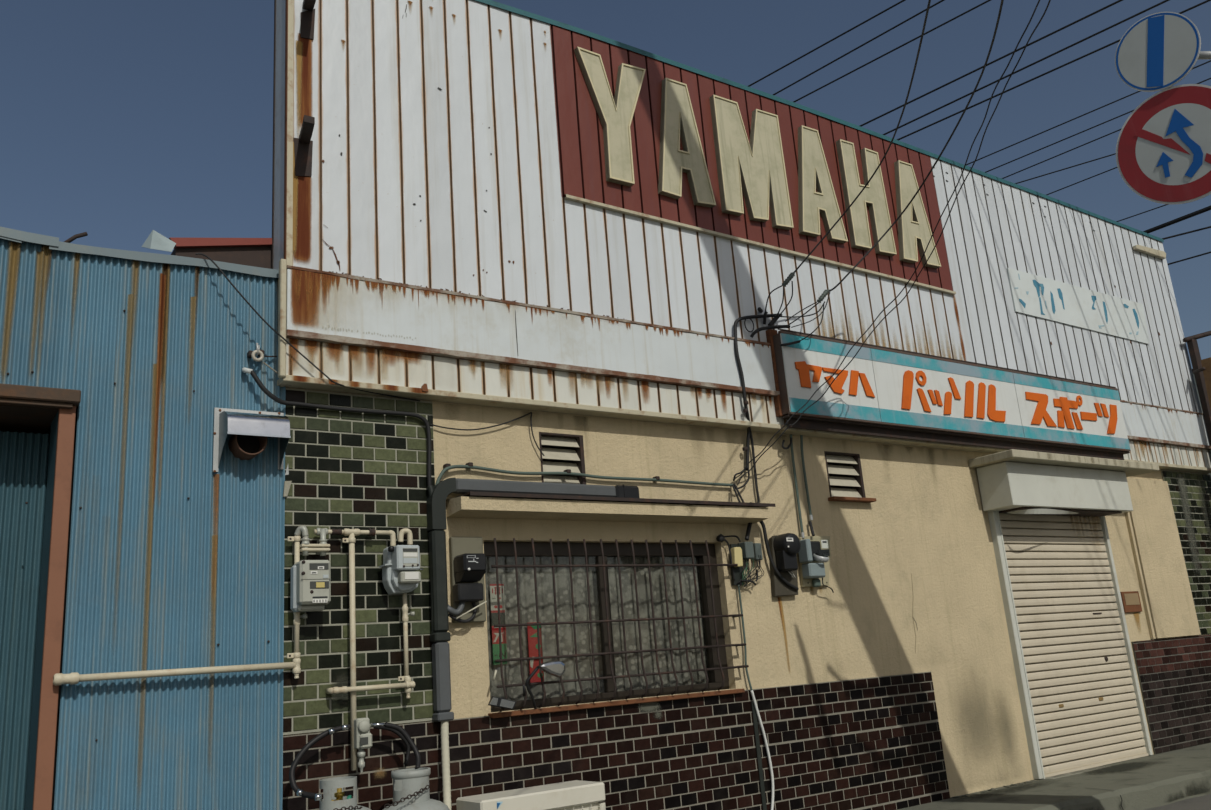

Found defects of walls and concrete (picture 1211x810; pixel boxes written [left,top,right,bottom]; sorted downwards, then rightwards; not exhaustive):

corrosion [296,33,312,125]
corrosion [277,142,484,382]
corrosion [3,241,21,371]
corrosion [31,245,52,362]
corrosion [526,306,682,336]
corrosion [383,384,427,393]
corrosion [569,372,649,398]
corrosion [691,387,726,407]
corrosion [139,263,170,760]
damp [1088,762,1152,774]
damp [964,784,1038,799]